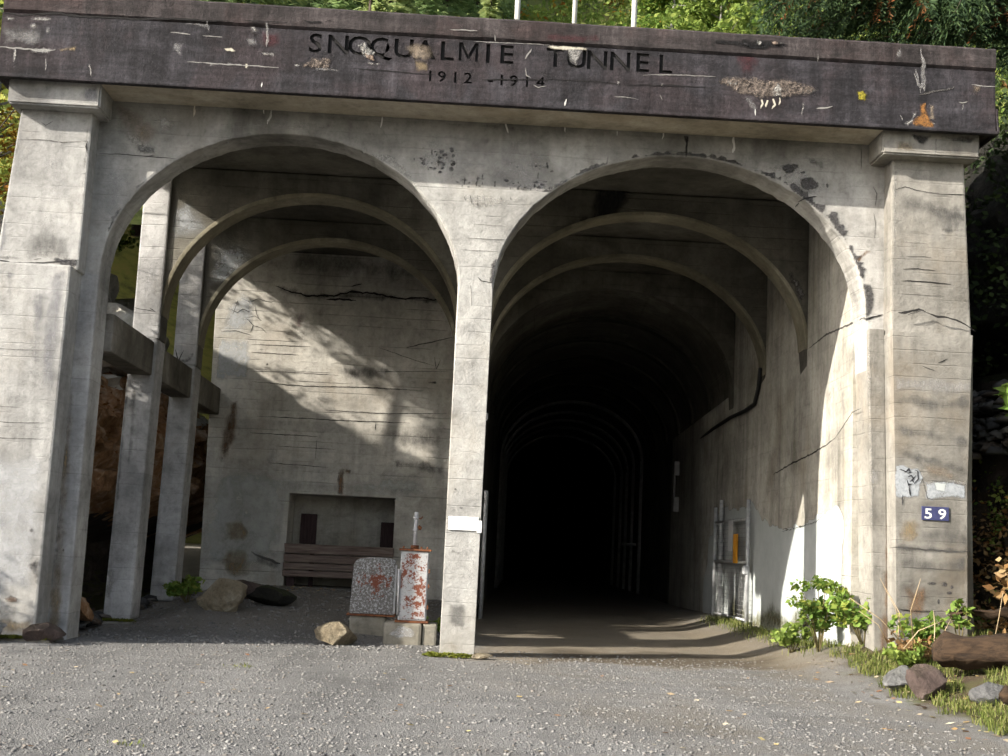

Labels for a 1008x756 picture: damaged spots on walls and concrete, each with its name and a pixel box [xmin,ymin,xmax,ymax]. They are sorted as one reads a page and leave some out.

spalling [720,77,814,108]
spalling [414,148,455,173]
spalling [464,163,567,206]
peeling [632,152,742,166]
peeling [762,164,873,317]
crack [810,242,976,348]
crack [221,284,452,467]
rust [222,403,236,455]
crack [774,408,861,474]